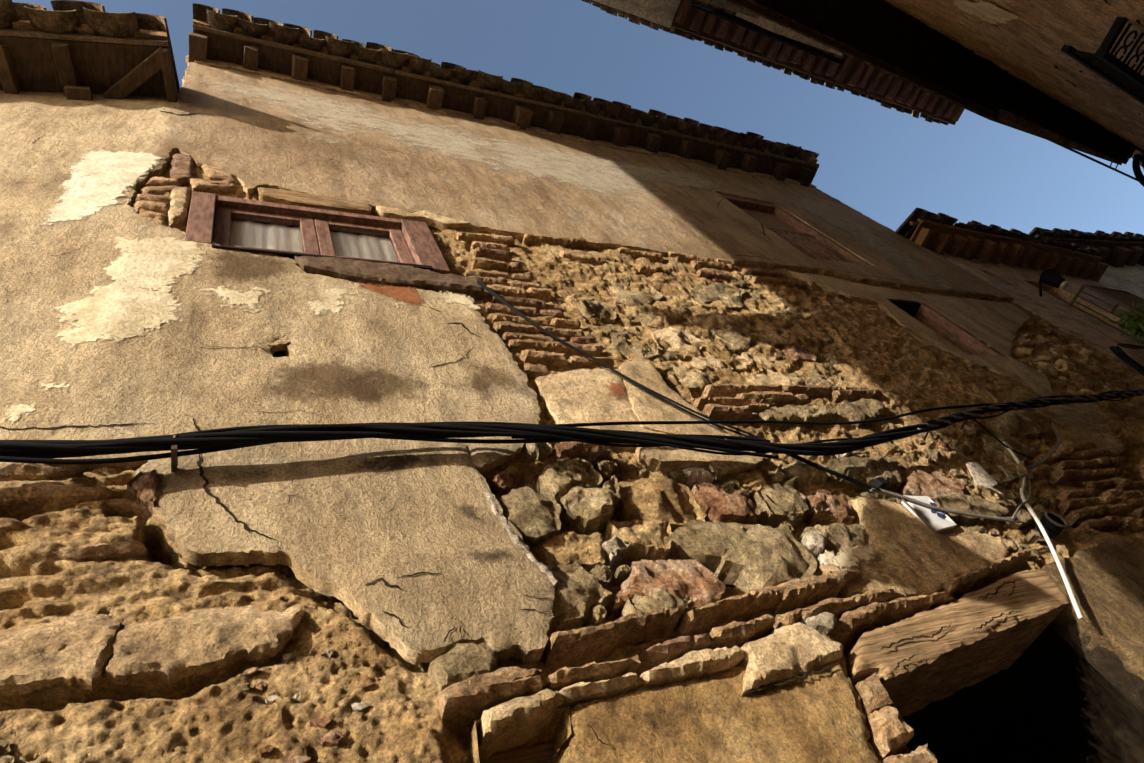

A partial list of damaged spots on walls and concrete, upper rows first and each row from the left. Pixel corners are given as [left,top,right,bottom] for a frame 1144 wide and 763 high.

peeling [31,150,298,349]
peeling [302,284,372,318]
spalling [439,232,886,429]
leakage [271,362,422,402]
spalling [0,463,161,537]
crack [193,418,280,542]
spalling [52,541,148,562]
crack [366,571,444,630]
spalling [427,408,1144,763]
spalling [236,667,300,705]
spalling [351,702,371,711]
spalling [0,740,15,763]